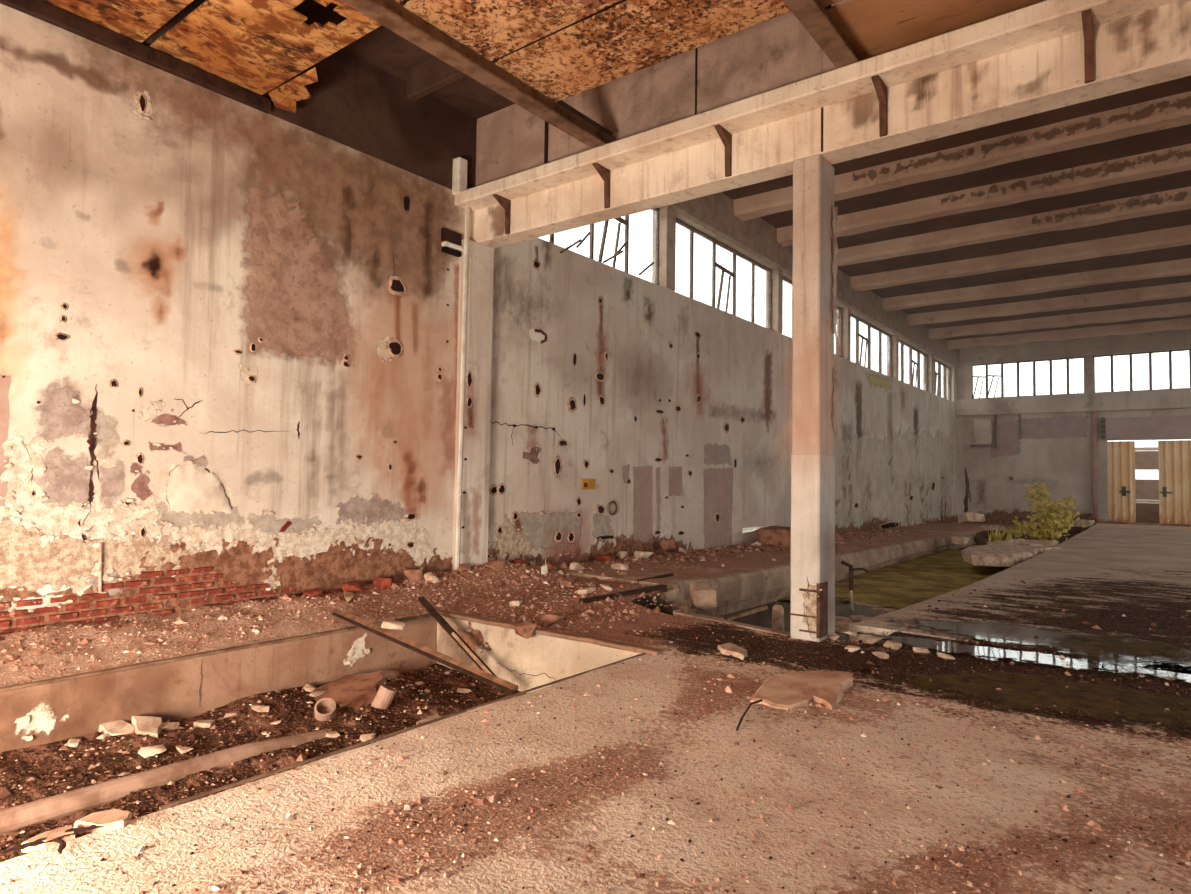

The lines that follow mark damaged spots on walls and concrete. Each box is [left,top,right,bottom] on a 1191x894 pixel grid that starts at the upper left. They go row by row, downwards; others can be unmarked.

damp [0,41,119,91]
spalling [853,96,1191,181]
spalling [941,150,1191,204]
peeling [86,40,455,385]
spalling [1032,192,1188,224]
rust [145,247,182,279]
crack [78,384,99,545]
spalling [0,375,453,634]
rust [405,453,425,513]